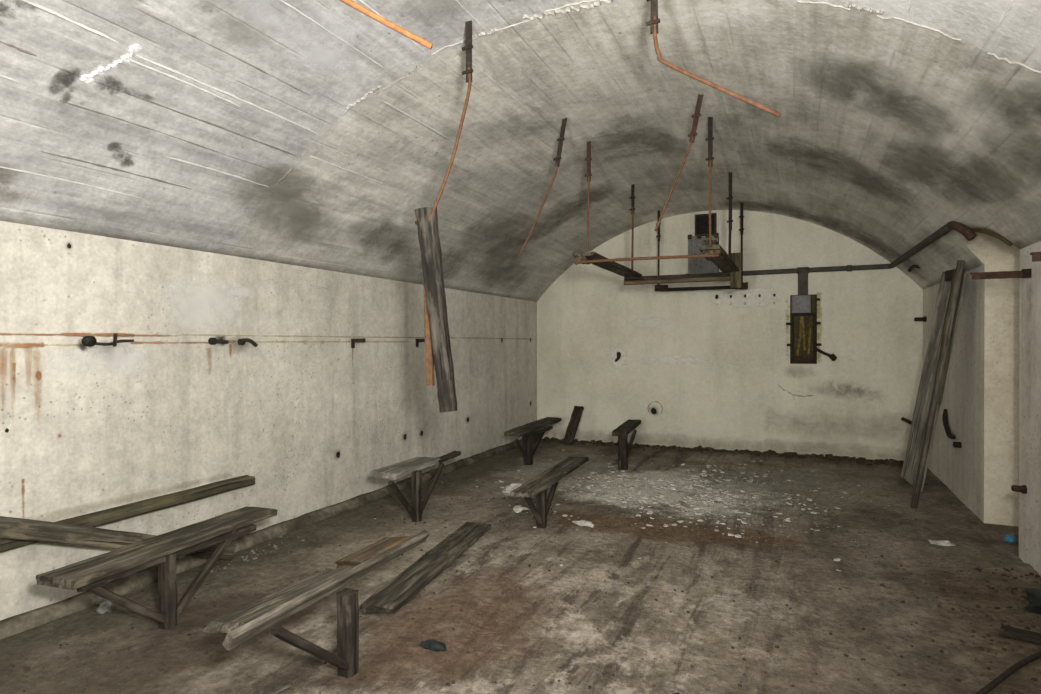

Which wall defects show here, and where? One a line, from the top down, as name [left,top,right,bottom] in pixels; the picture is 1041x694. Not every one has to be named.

crack [798,1,961,41]
crack [987,52,1041,73]
crack [50,0,630,185]
crack [41,151,190,189]
leakage [108,143,133,166]
corrosion [0,333,255,386]
corrosion [267,335,422,358]